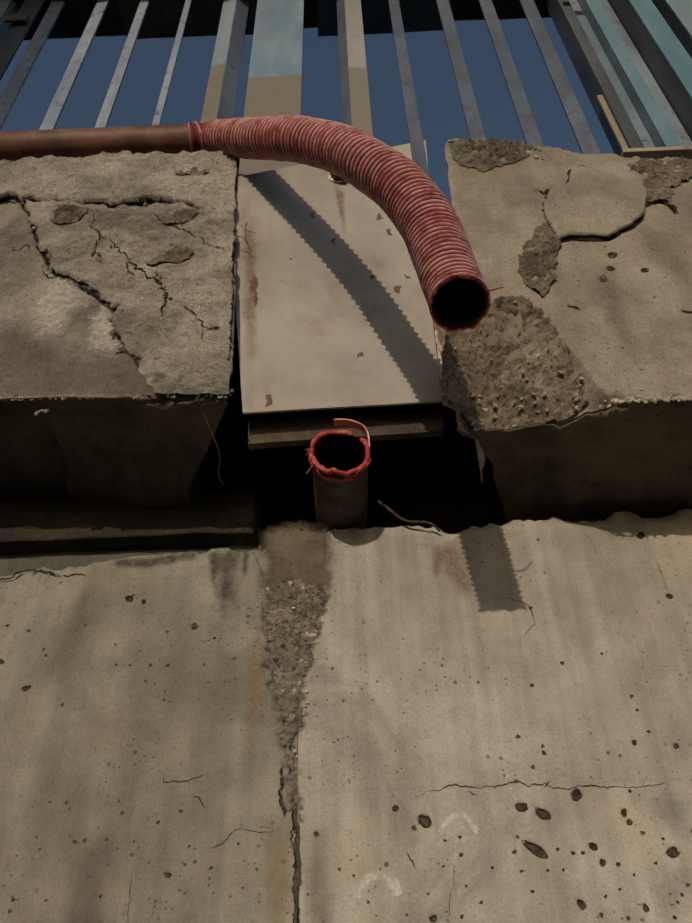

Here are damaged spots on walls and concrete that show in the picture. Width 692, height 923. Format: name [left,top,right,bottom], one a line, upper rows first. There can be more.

spalling [450,137,533,172]
crack [0,196,142,367]
crack [89,214,221,338]
crack [143,201,224,248]
spalling [439,156,692,432]
crack [0,569,86,580]
crack [208,720,300,923]
spalling [260,579,330,923]
crack [417,781,663,797]